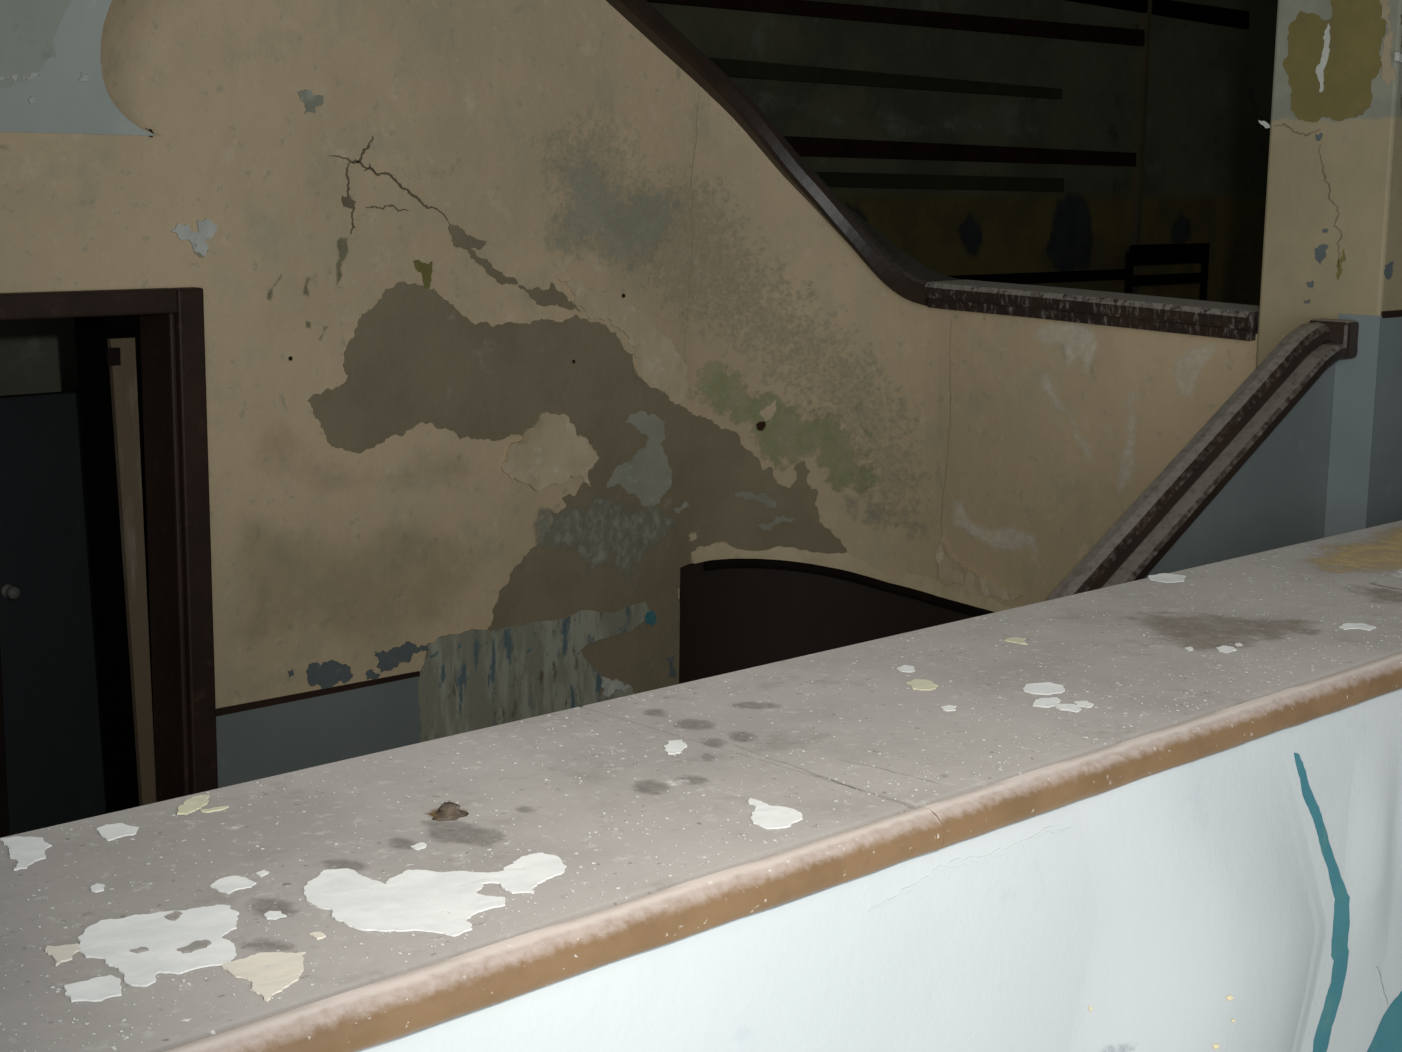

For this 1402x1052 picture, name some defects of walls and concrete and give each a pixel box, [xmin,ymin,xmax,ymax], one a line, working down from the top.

peeling [1283,0,1402,141]
crack [329,136,580,311]
crack [1275,123,1346,280]
water stain [695,363,874,492]
peeling [288,260,847,743]
water stain [1314,528,1402,572]
peeling [1023,682,1094,713]
peeling [0,836,52,871]
peeling [45,870,326,1003]
peeling [304,852,567,937]
peeling [1294,753,1350,1052]
peeling [1367,991,1402,1052]